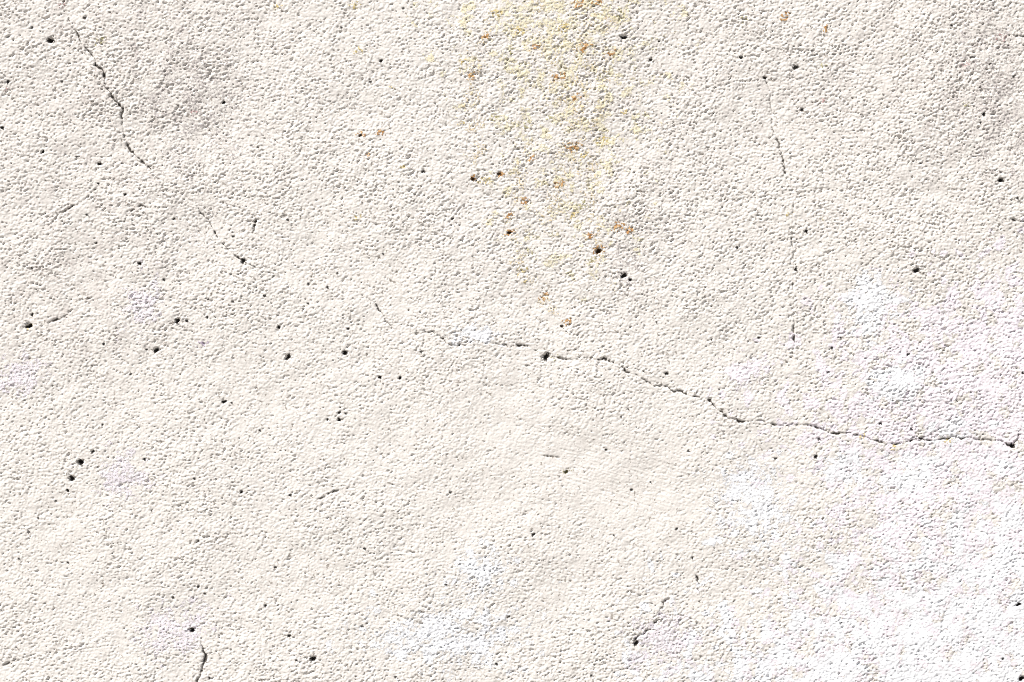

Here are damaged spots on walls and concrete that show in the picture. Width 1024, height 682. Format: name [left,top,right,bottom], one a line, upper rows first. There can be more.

crack [69,20,151,169]